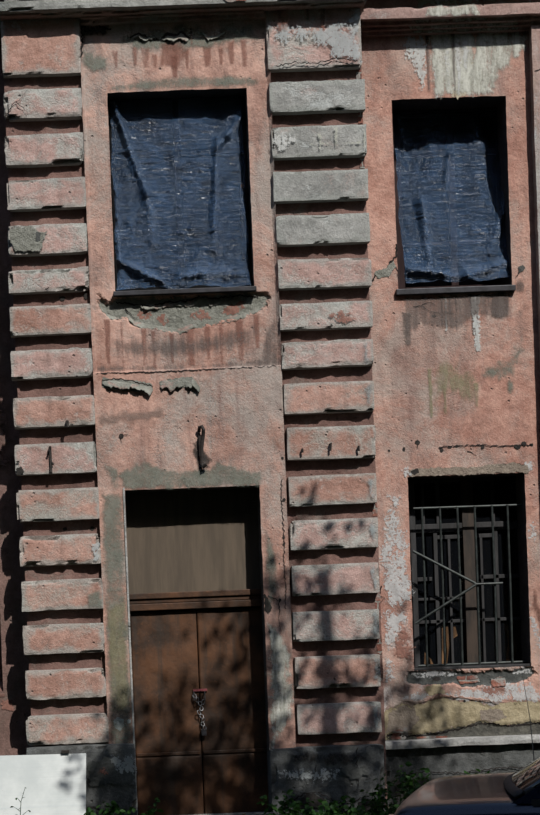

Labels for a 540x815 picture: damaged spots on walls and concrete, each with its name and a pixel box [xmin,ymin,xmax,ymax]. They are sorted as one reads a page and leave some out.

peeling [268,13,362,79]
damp [402,0,528,100]
flaking render [98,293,269,335]
flaking render [159,377,200,392]
peeling [372,494,416,686]
flaking render [384,667,540,741]